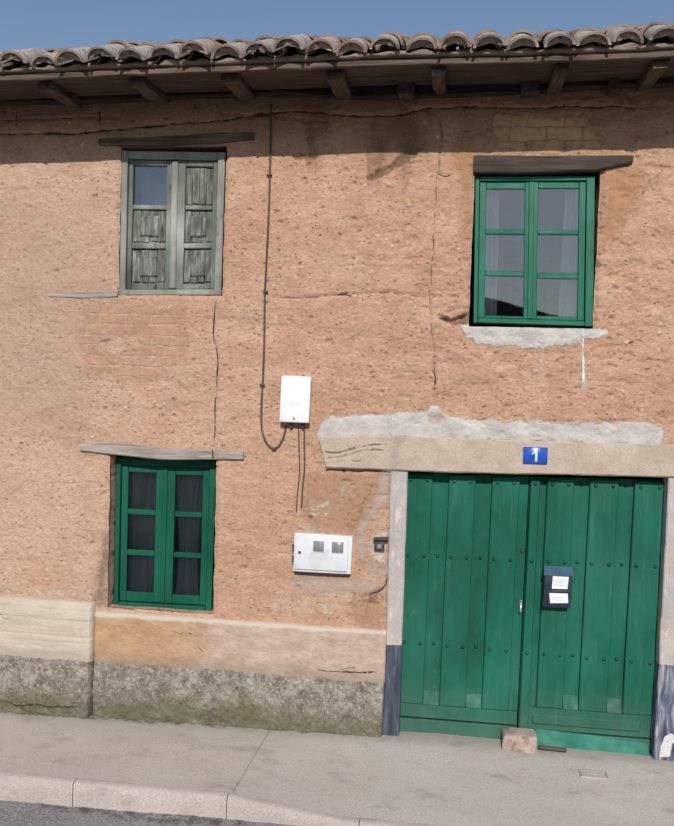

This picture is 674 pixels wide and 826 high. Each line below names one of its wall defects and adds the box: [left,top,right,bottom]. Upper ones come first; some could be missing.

crack [0,98,664,343]
crack [211,303,219,459]
crack [316,666,374,674]